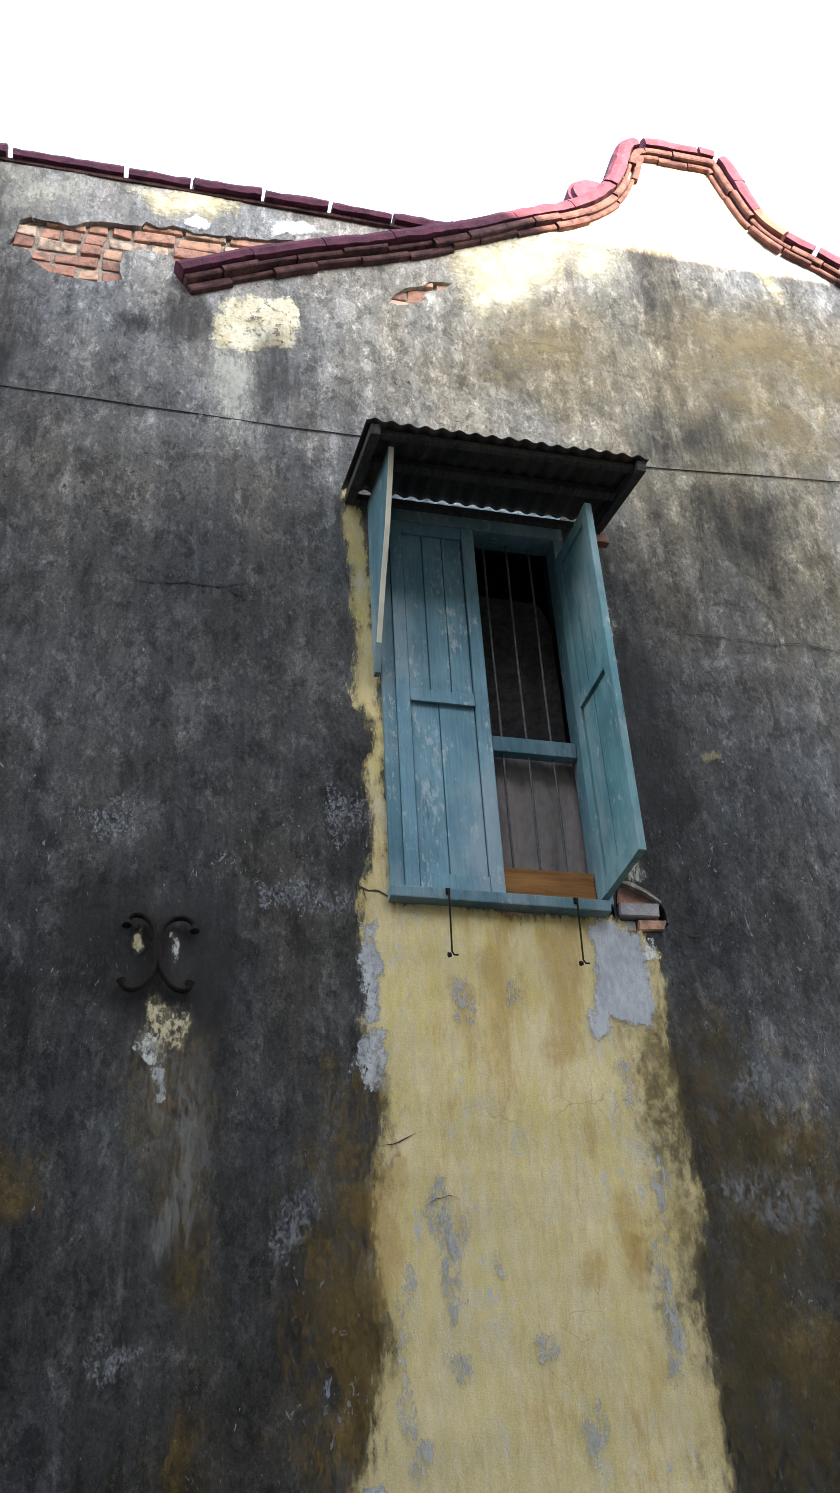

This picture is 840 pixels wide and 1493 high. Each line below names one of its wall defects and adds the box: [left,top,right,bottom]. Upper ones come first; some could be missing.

flaking render [10,222,269,282]
flaking render [389,283,448,305]
peeling [133,929,144,952]
leakage [132,908,221,1023]
peeling [349,919,388,1092]
peeling [587,881,666,1040]
peeling [132,1001,206,1247]
peeling [423,1175,469,1325]